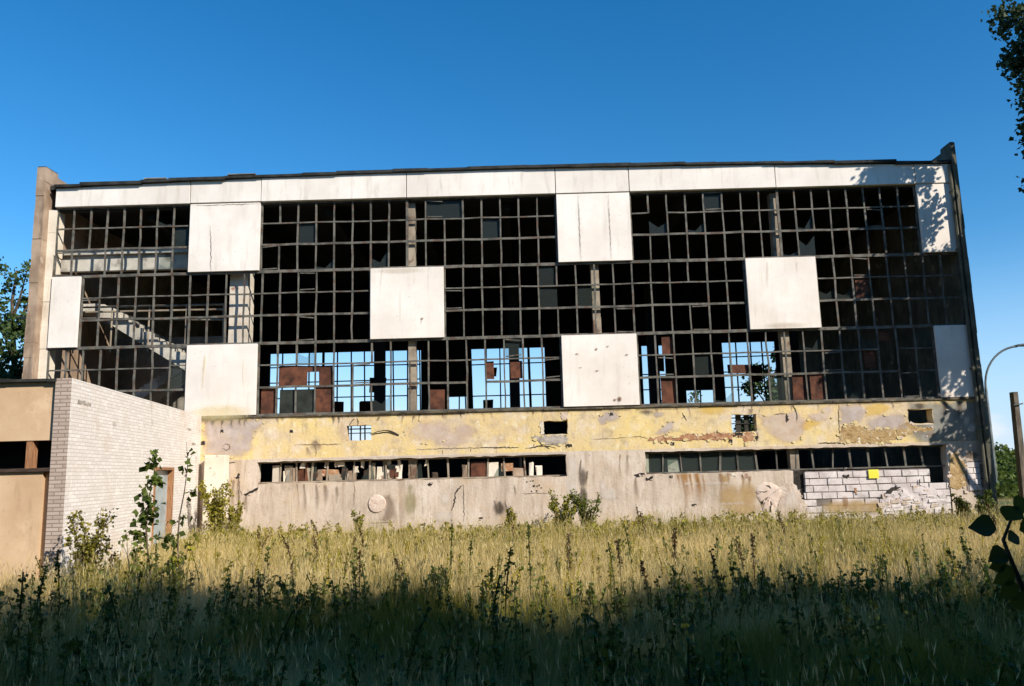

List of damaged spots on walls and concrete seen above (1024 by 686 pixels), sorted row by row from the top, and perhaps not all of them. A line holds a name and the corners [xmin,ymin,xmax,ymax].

crack [449,485,465,515]
damp [411,452,588,507]
spalling [531,420,572,447]
peeling [648,402,985,519]